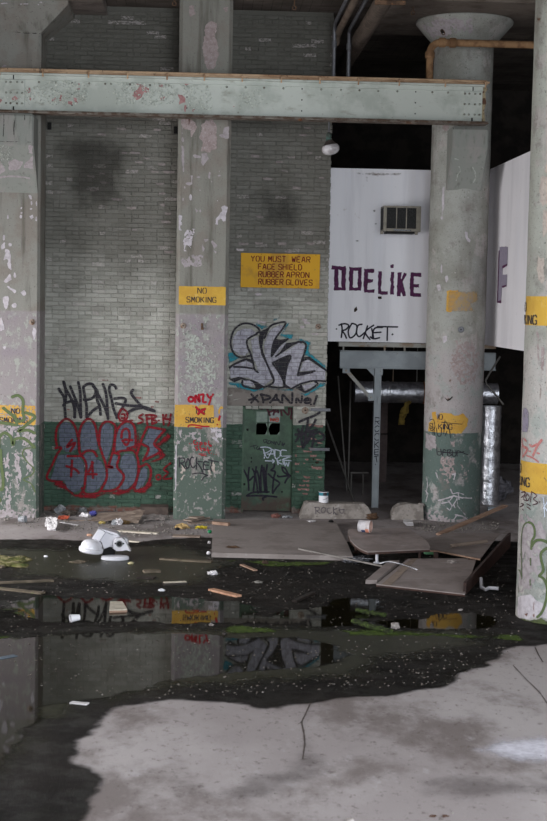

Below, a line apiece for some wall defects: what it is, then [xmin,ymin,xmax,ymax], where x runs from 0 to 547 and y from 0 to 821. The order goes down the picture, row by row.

peeling [113,82,229,268]
peeling [1,235,26,309]
peeling [0,425,36,518]
leakage [0,537,547,821]
crack [299,702,311,759]